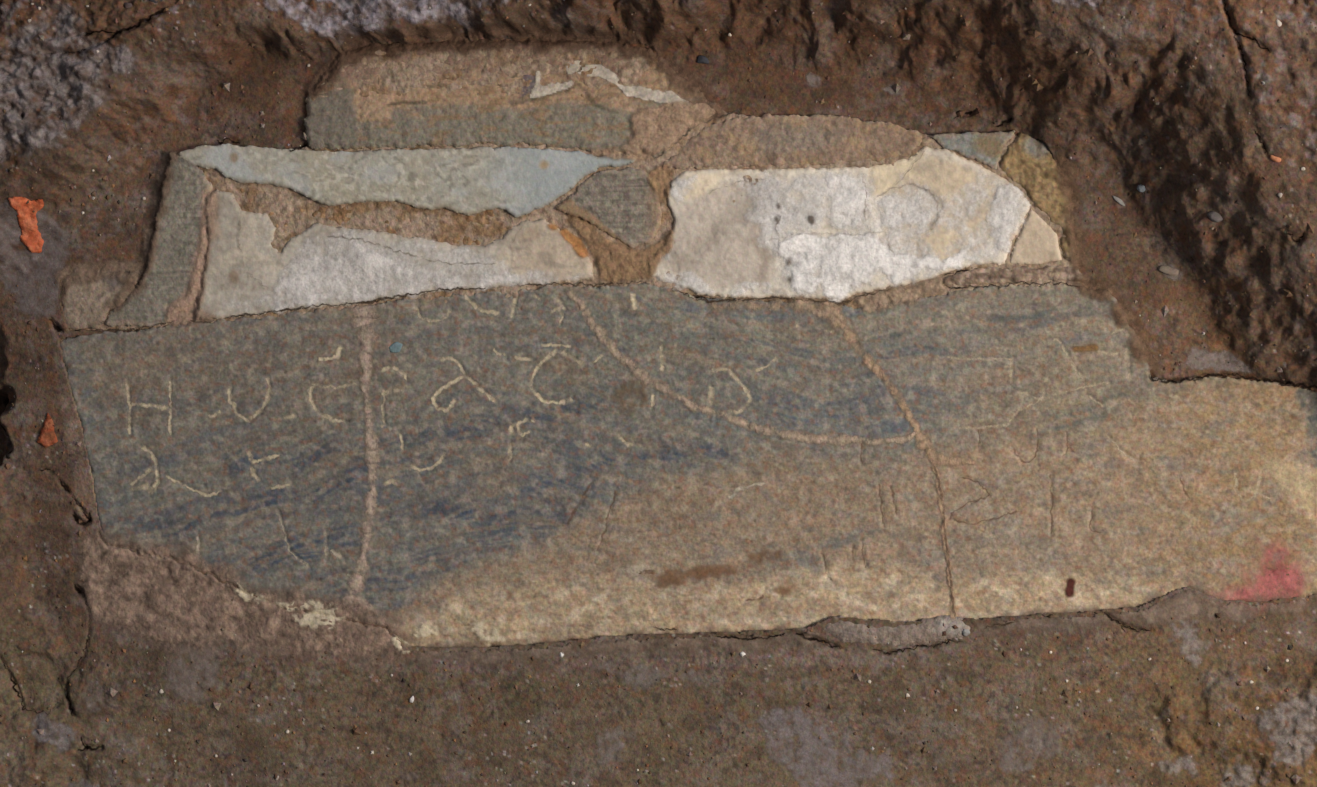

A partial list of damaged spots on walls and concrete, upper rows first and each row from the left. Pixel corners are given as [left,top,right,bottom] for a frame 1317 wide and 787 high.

crack [1223,0,1270,97]
crack [41,468,91,525]
crack [523,281,1151,655]
crack [1,584,100,751]